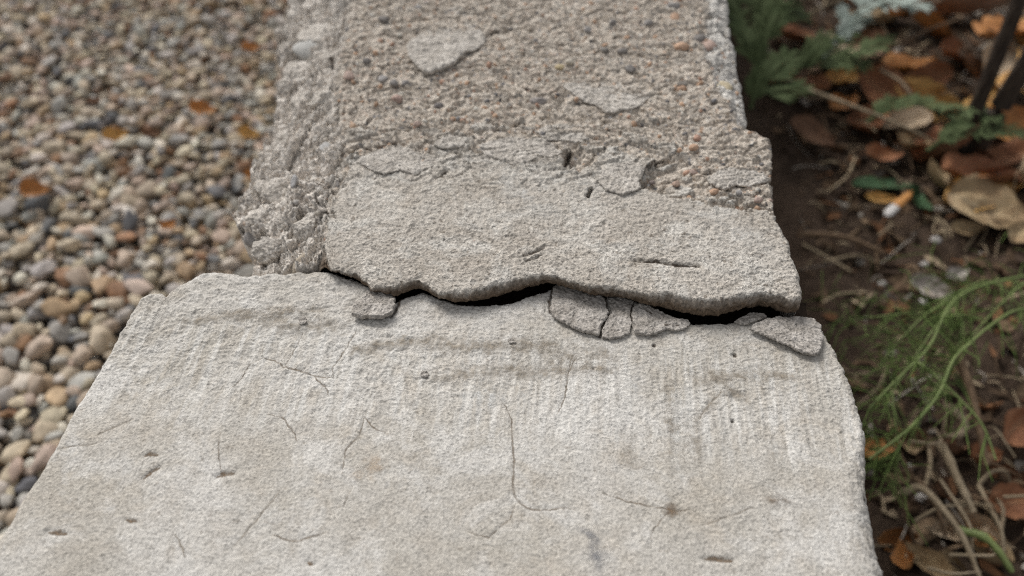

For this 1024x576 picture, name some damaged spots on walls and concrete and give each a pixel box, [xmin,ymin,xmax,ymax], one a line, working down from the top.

spalling [326,0,773,210]
crack [329,271,368,287]
spalling [351,290,396,319]
crack [390,283,556,318]
crack [584,292,807,338]
crack [475,402,575,538]